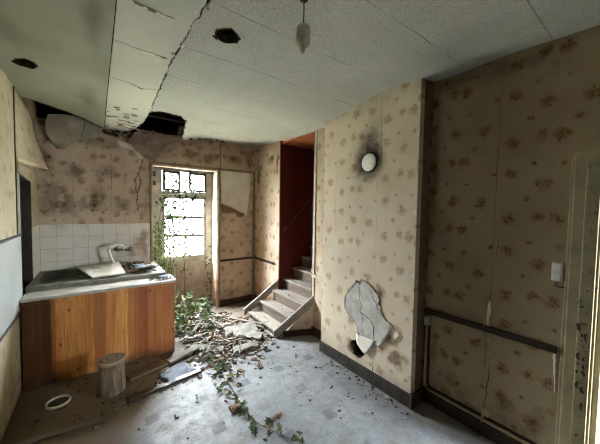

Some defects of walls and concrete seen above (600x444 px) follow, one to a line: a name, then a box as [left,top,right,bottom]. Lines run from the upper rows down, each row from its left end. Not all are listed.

crack [109,0,211,113]
peeling [102,106,141,139]
spalling [344,279,400,358]